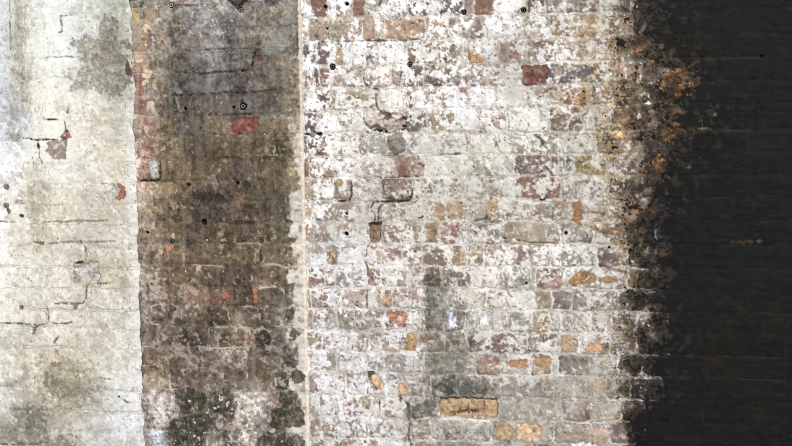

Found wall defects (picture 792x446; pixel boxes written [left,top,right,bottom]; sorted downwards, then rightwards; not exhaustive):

water stain [68,17,132,96]
spalling [25,126,71,160]
peeling [101,183,126,200]
crack [5,283,107,343]
water stain [143,308,305,446]